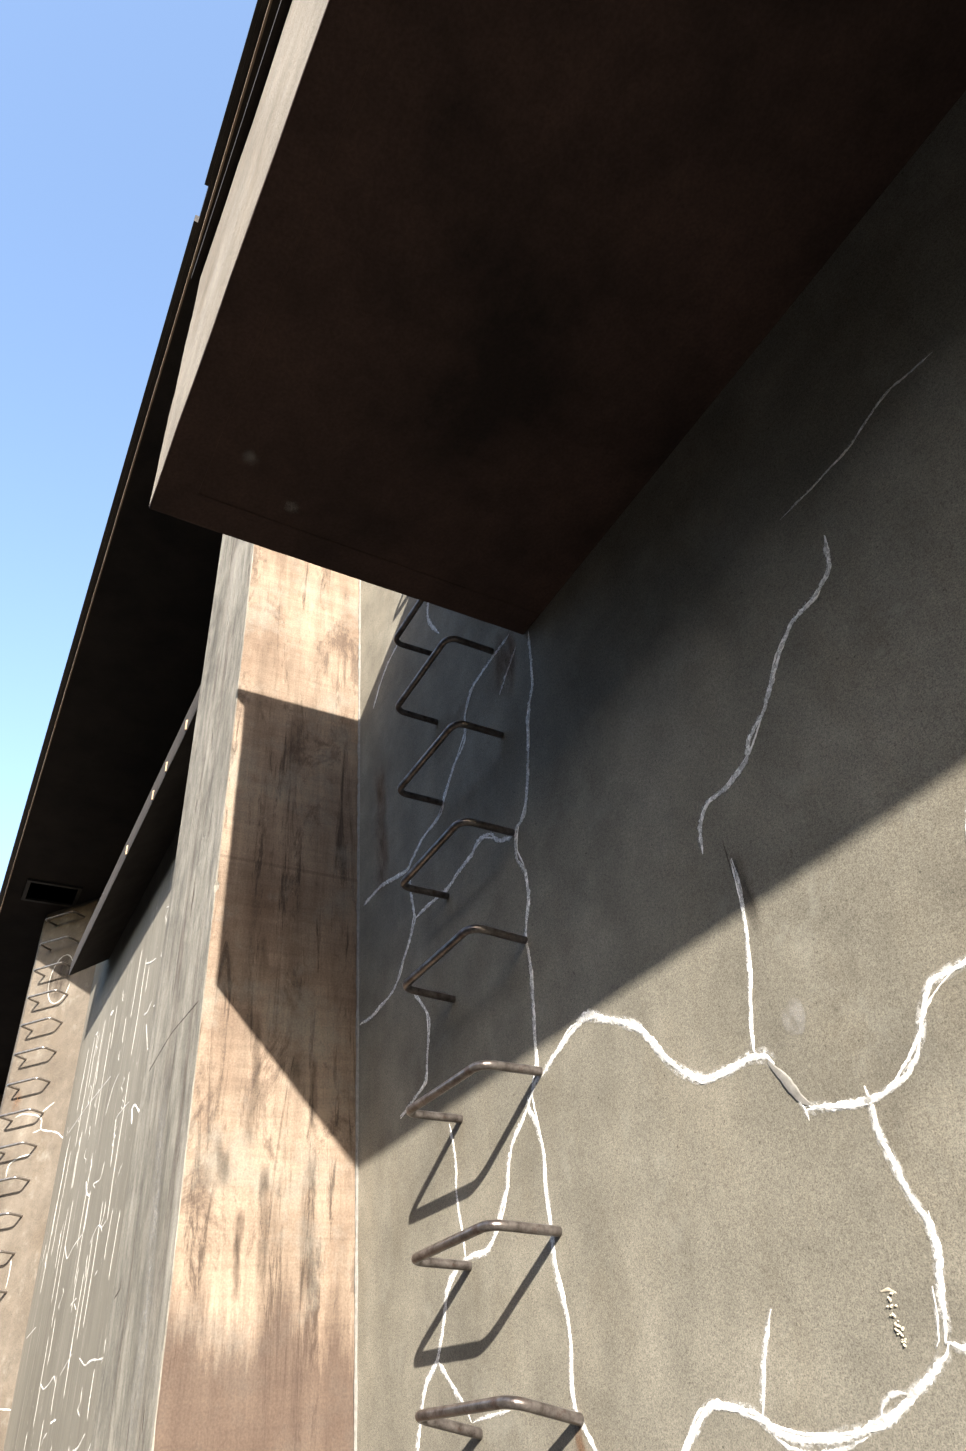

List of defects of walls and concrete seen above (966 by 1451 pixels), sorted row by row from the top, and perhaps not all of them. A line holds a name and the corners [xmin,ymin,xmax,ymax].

crack [780,354,930,520]
crack [0,952,199,1451]
crack [360,535,831,1451]
crack [682,958,966,1451]